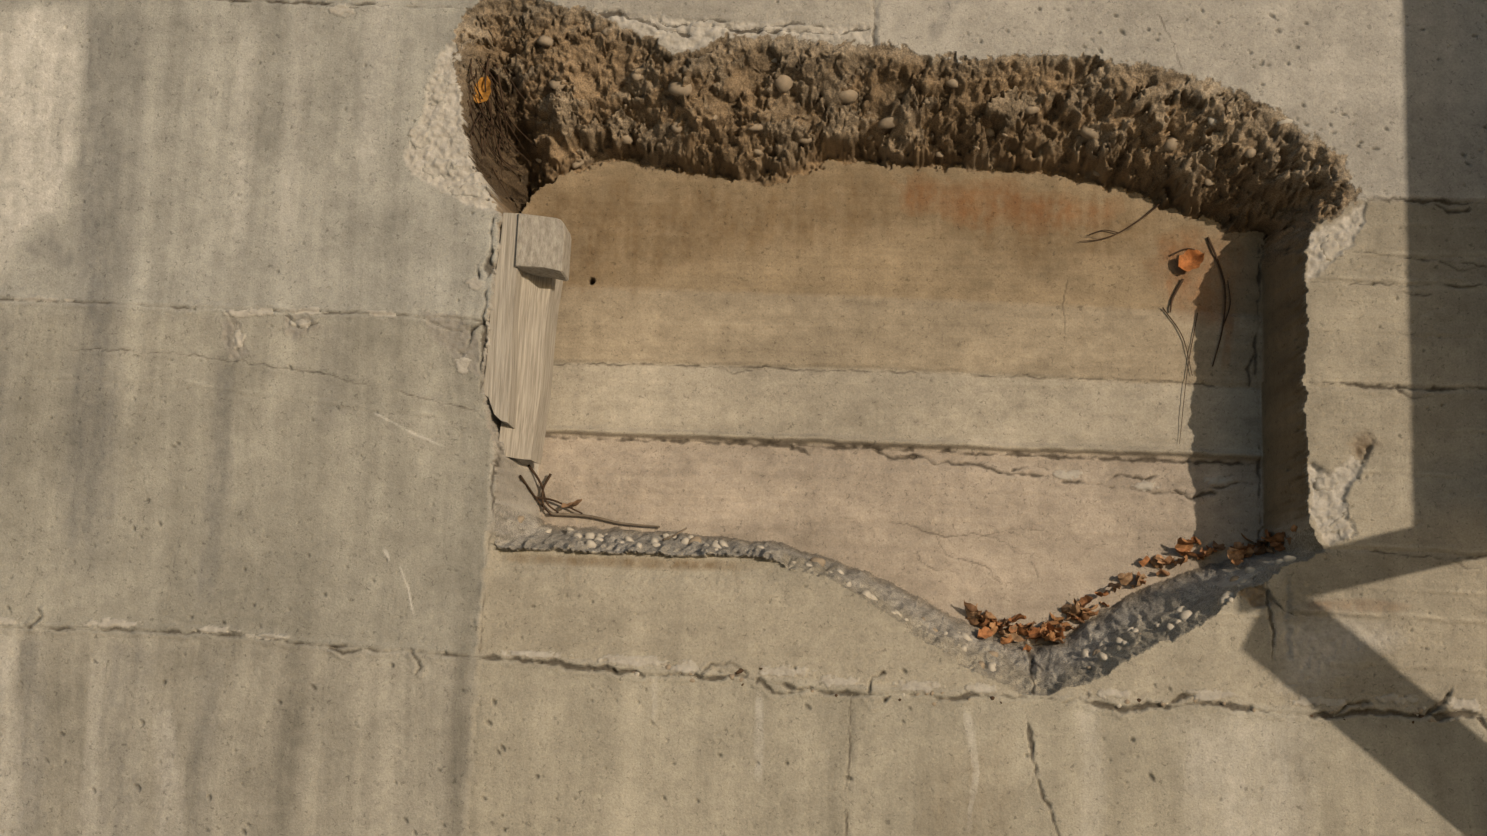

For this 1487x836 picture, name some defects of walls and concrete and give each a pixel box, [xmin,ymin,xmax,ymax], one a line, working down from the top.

crack [594,0,878,51]
spalling [401,0,1369,286]
crack [1078,199,1164,242]
crack [1359,196,1487,215]
spalling [418,309,485,379]
corrosion [1142,223,1256,370]
crack [0,216,1487,836]
spalling [494,425,1412,701]